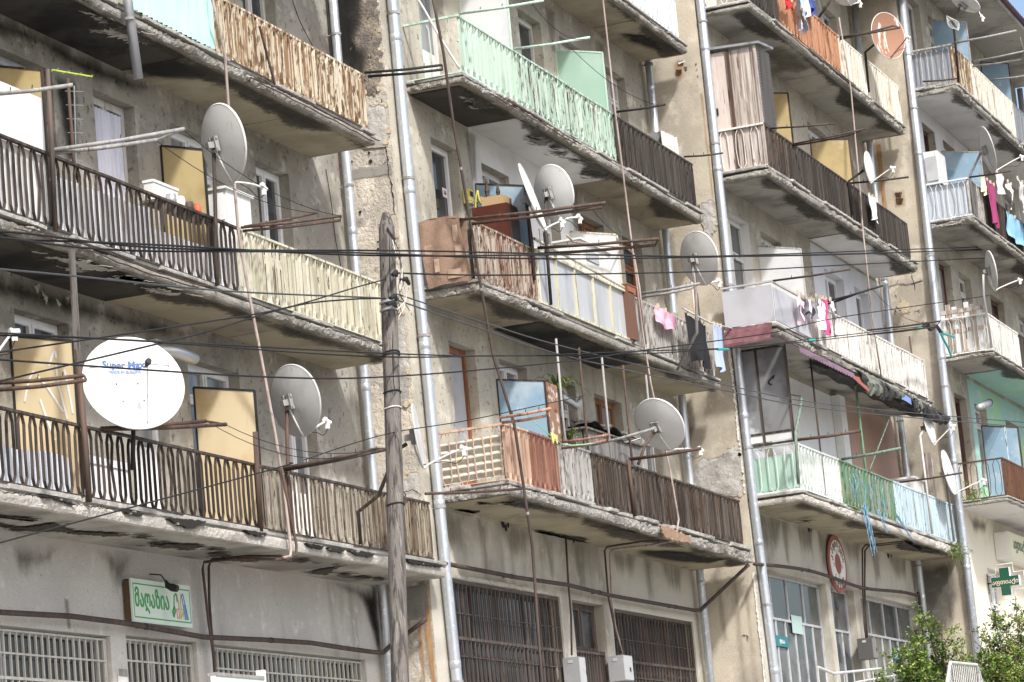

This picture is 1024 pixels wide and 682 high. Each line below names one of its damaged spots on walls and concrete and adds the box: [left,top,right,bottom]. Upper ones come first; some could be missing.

water stain [460,86,697,224]
peeling [33,283,69,311]
peeling [14,227,207,296]
water stain [761,179,914,276]
spalling [693,349,745,497]